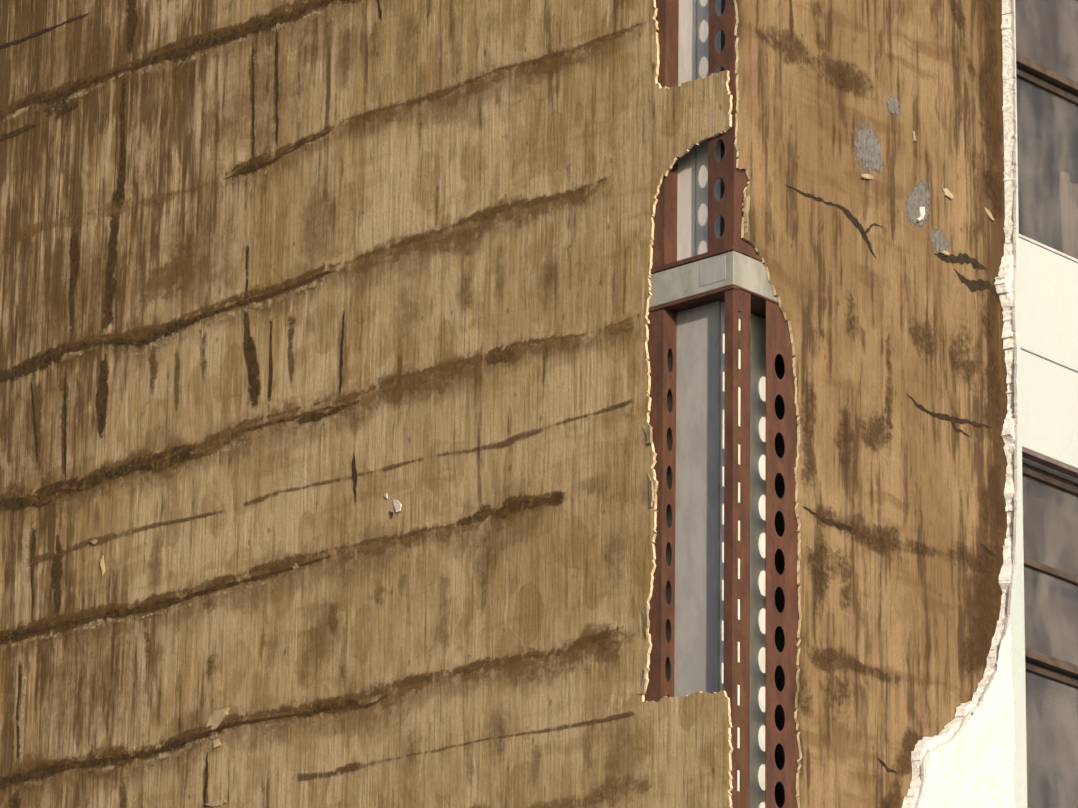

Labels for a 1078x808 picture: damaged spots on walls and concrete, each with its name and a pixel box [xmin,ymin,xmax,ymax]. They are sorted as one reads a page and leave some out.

peeling [855,124,882,180]
water stain [0,0,639,512]
crack [786,185,881,259]
peeling [906,182,950,256]
crack [934,253,999,302]
crack [908,395,993,437]
water stain [0,491,564,644]
water stain [809,465,1006,672]
peeling [642,606,650,639]
water stain [0,624,620,808]
peeling [919,624,1016,808]
water stain [883,729,918,808]